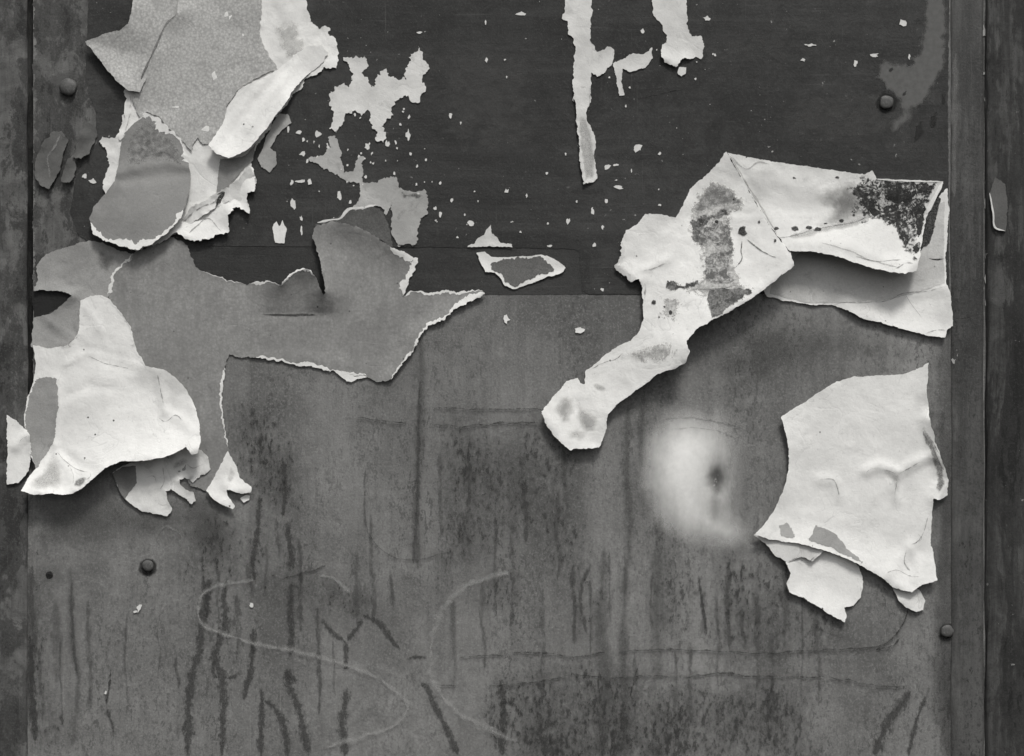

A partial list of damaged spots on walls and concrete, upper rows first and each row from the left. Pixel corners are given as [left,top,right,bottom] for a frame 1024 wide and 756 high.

peeling [877,0,957,140]